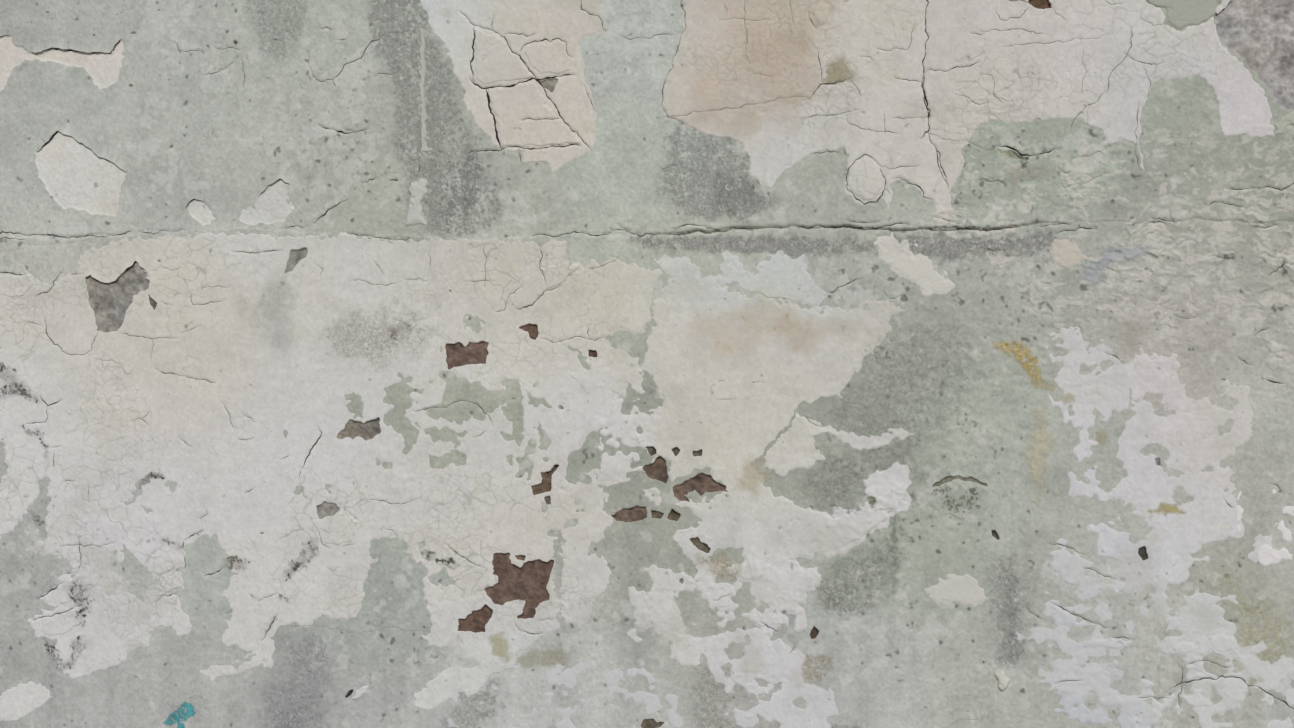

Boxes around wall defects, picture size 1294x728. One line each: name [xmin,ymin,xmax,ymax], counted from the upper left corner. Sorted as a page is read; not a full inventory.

peeling [0,30,136,91]
peeling [661,0,1294,224]
crack [0,229,181,240]
crack [465,224,749,312]
peeling [873,231,955,297]
crack [0,272,254,440]
crack [27,398,89,493]
crack [281,428,322,477]
peeling [0,174,914,728]
crack [157,511,221,601]
peeling [1015,327,1294,728]